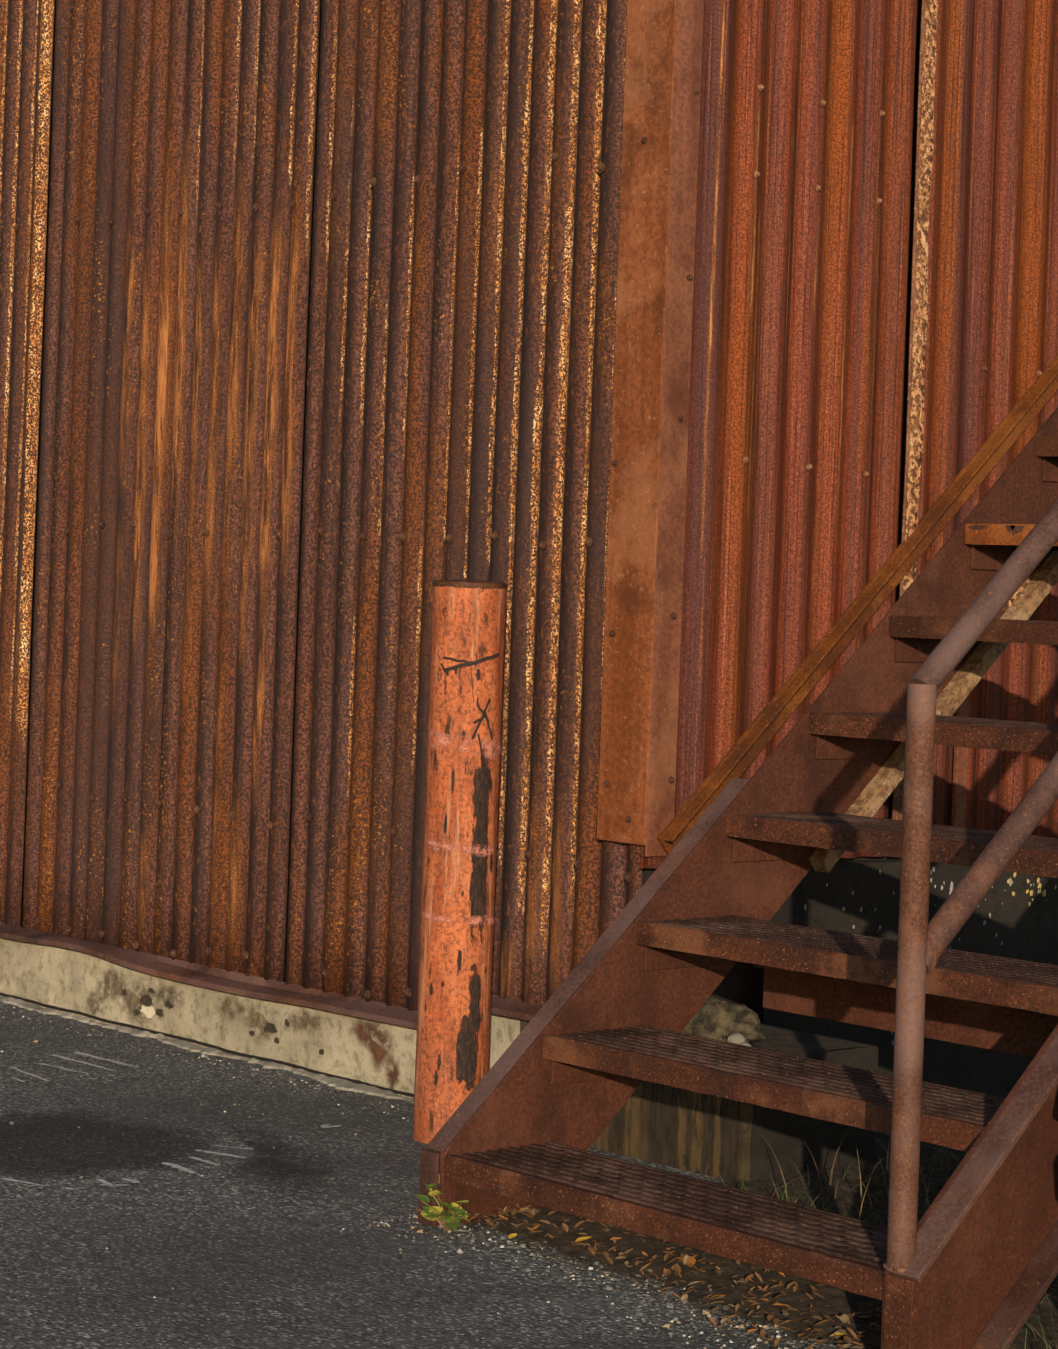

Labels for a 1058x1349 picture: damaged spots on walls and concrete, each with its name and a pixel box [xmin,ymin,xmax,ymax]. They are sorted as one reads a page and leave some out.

corrosion [0,0,54,736]
corrosion [121,0,338,622]
corrosion [339,240,349,421]
corrosion [360,197,371,436]
corrosion [377,305,389,543]
corrosion [403,177,414,459]
corrosion [443,136,460,536]
corrosion [464,132,483,577]
corrosion [486,0,608,954]
corrosion [253,657,264,759]
corrosion [347,618,356,796]
corrosion [413,535,423,758]